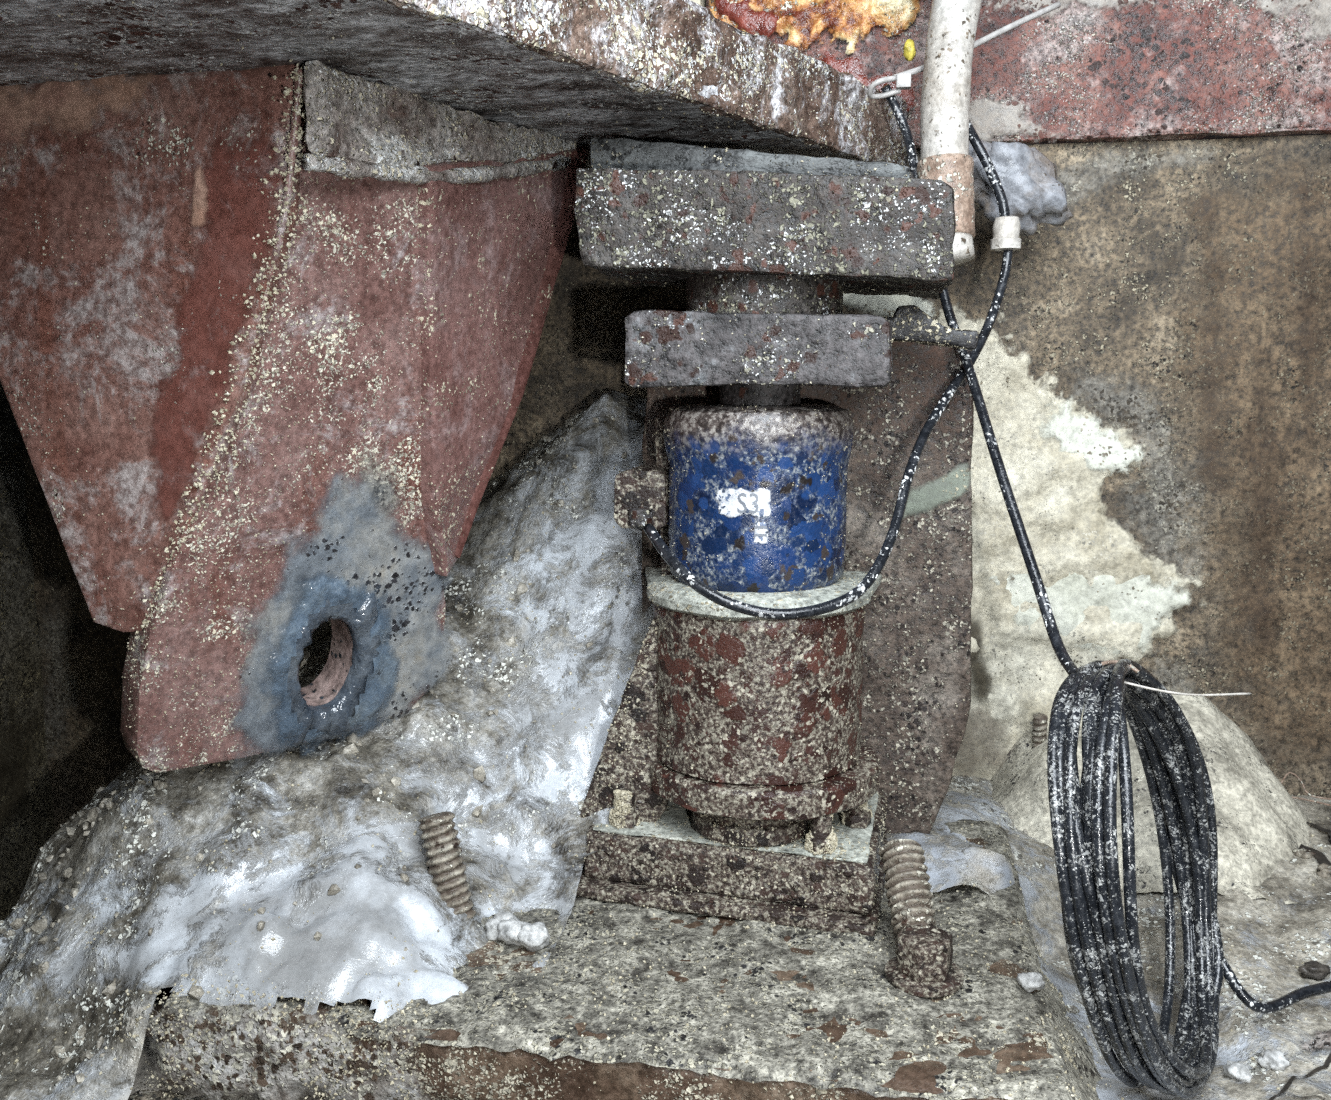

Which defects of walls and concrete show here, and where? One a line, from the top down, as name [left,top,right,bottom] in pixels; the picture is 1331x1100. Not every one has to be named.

rust [709,0,921,112]